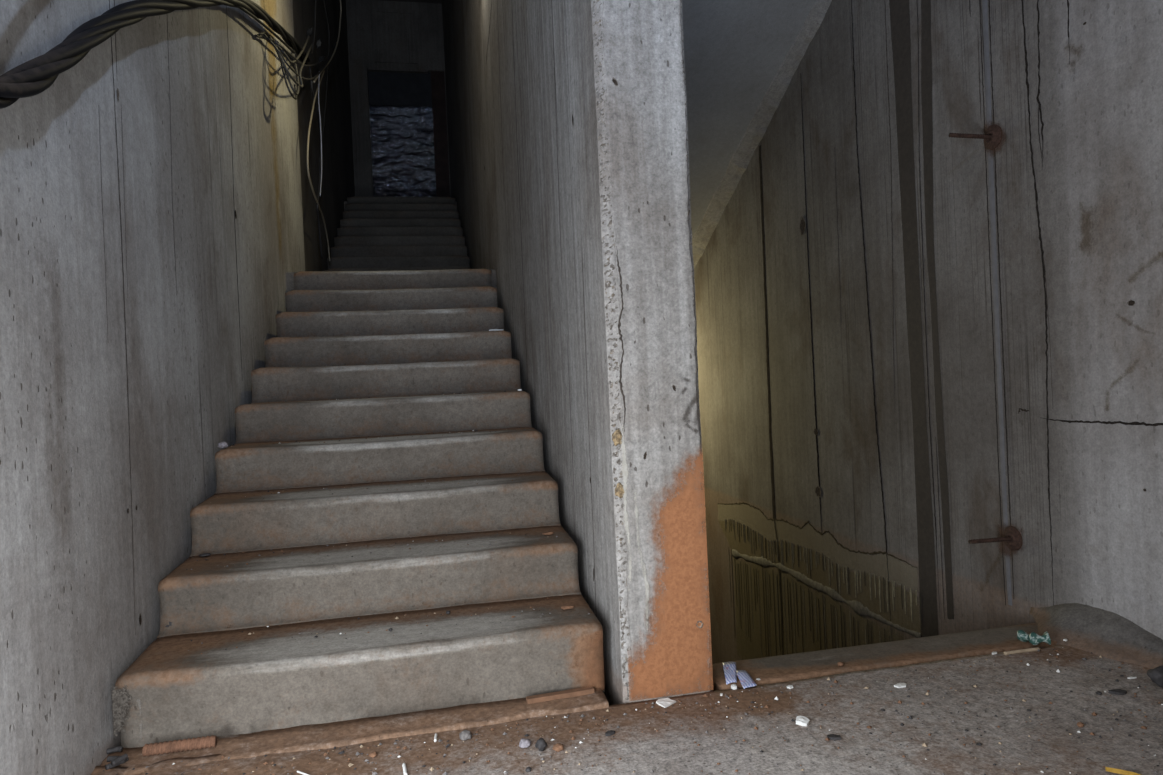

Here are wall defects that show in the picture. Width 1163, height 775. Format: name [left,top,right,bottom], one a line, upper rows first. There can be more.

crack [616,247,626,424]
crack [1021,0,1163,606]